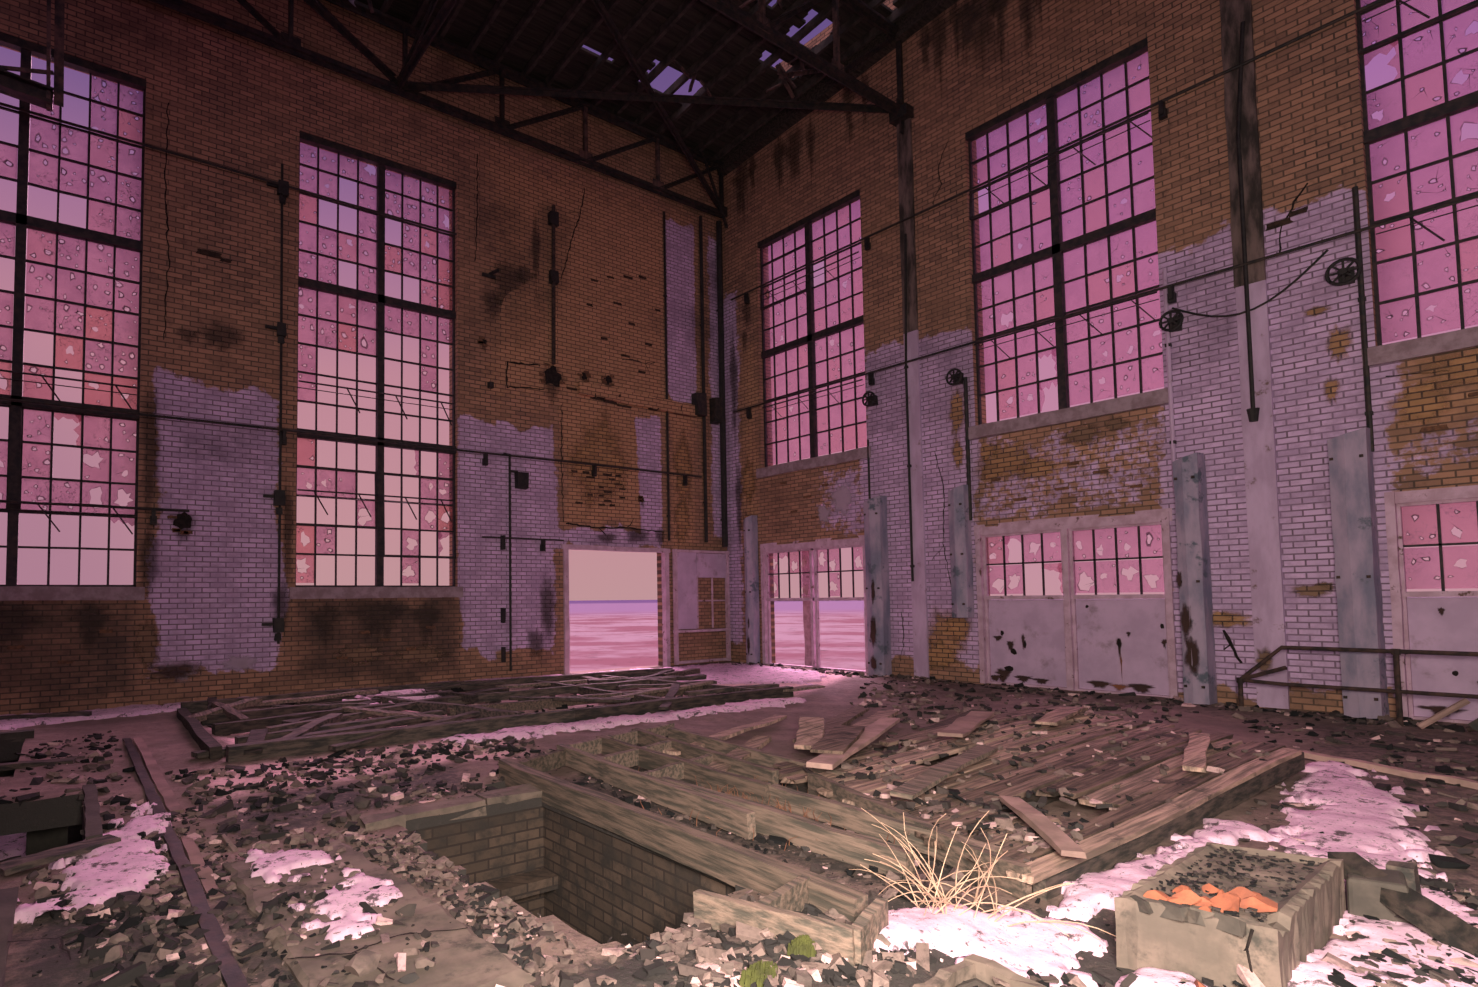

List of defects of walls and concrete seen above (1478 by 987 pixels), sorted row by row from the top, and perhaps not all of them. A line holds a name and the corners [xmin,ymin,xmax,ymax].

damp [920,0,1041,74]
peeling [950,391,1109,501]
peeling [1063,417,1128,444]
spalling [167,512,193,537]
peeling [136,621,199,684]
peeling [928,613,970,668]